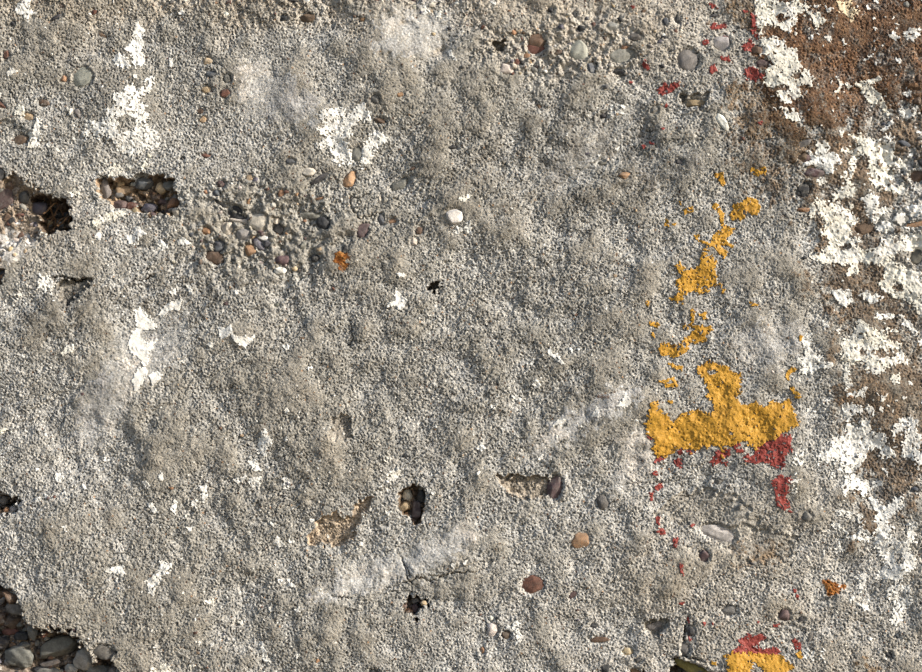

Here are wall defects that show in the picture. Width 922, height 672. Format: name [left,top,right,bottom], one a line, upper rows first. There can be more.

peeling [18,117,51,152]
peeling [60,16,180,252]
spalling [0,171,81,285]
peeling [643,76,922,630]
peeling [233,420,287,488]
spalling [0,491,21,516]
peeling [191,476,208,509]
spalling [306,457,435,548]
peeling [105,565,126,582]
spalling [0,584,119,672]
spalling [644,617,671,638]
peeling [711,633,826,672]